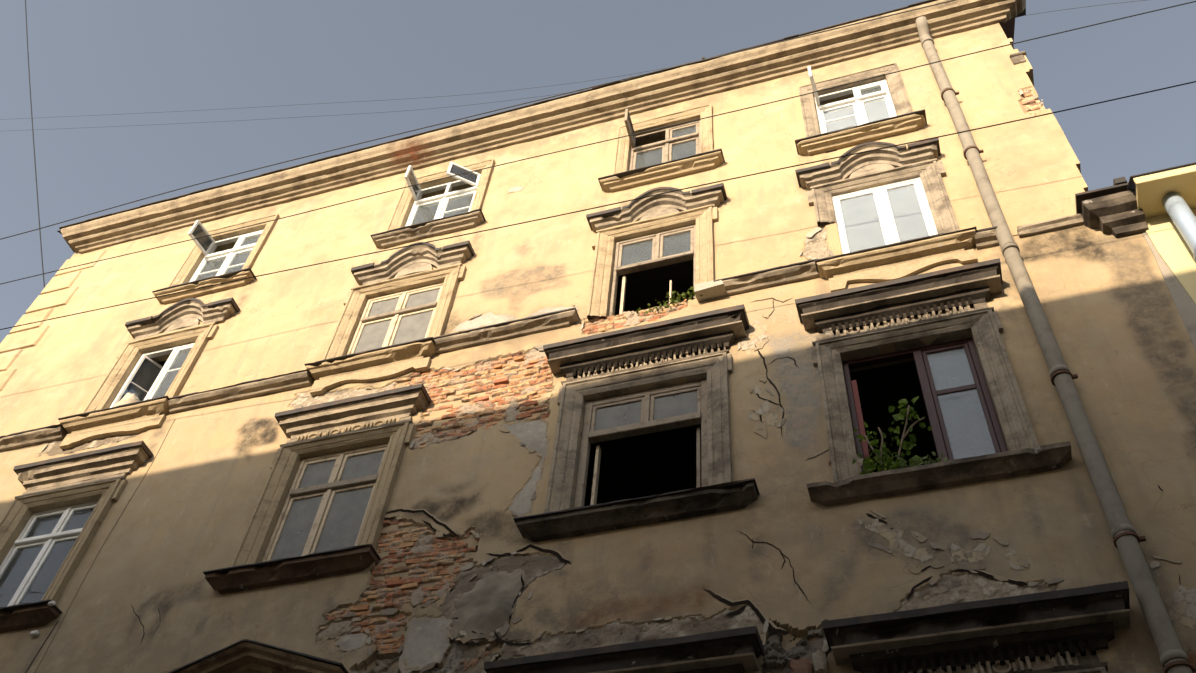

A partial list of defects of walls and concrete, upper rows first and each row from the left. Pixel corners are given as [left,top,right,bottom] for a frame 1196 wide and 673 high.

flaking render [1019,88,1043,114]
flaking render [800,227,834,260]
flaking render [451,299,688,334]
crack [752,298,799,437]
flaking render [290,343,553,517]
flaking render [318,515,829,673]
crack [703,587,787,634]
crack [736,530,810,603]
flaking render [857,508,1064,611]
peeling [1157,584,1196,653]